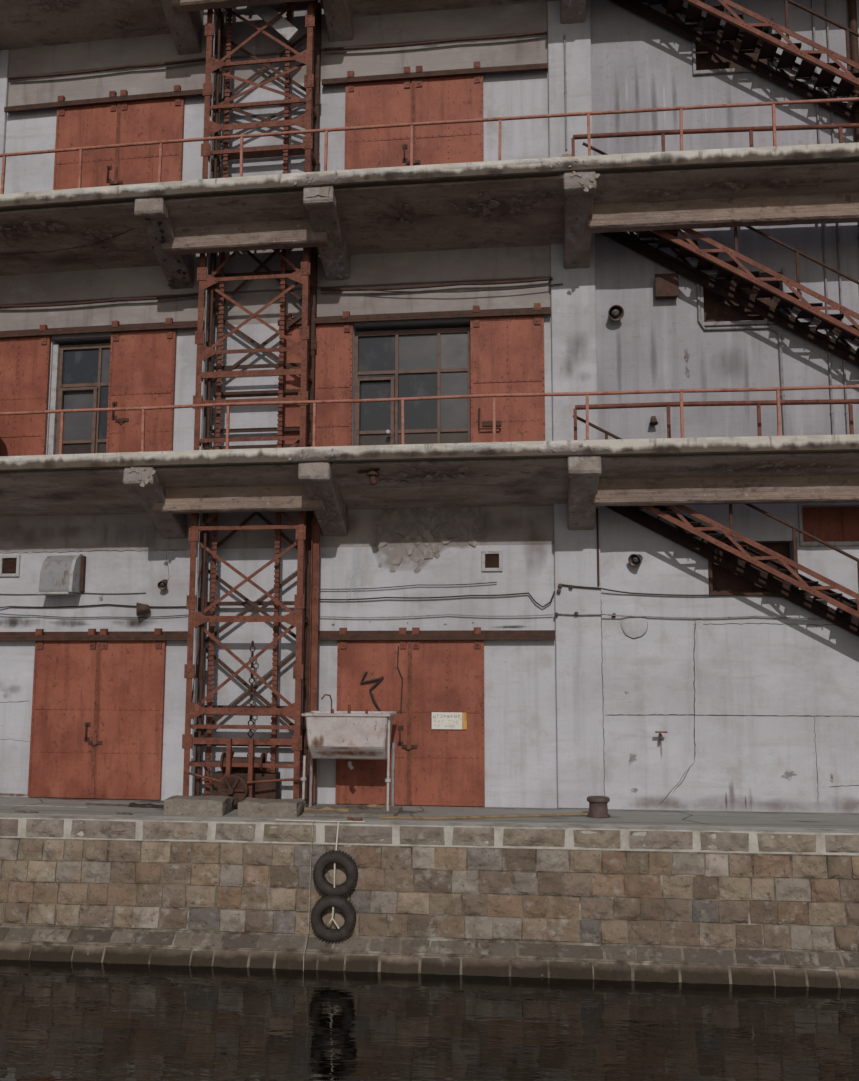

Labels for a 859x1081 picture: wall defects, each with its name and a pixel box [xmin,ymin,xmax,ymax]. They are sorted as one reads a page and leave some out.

peeling [374,507,485,573]
crack [650,623,859,824]